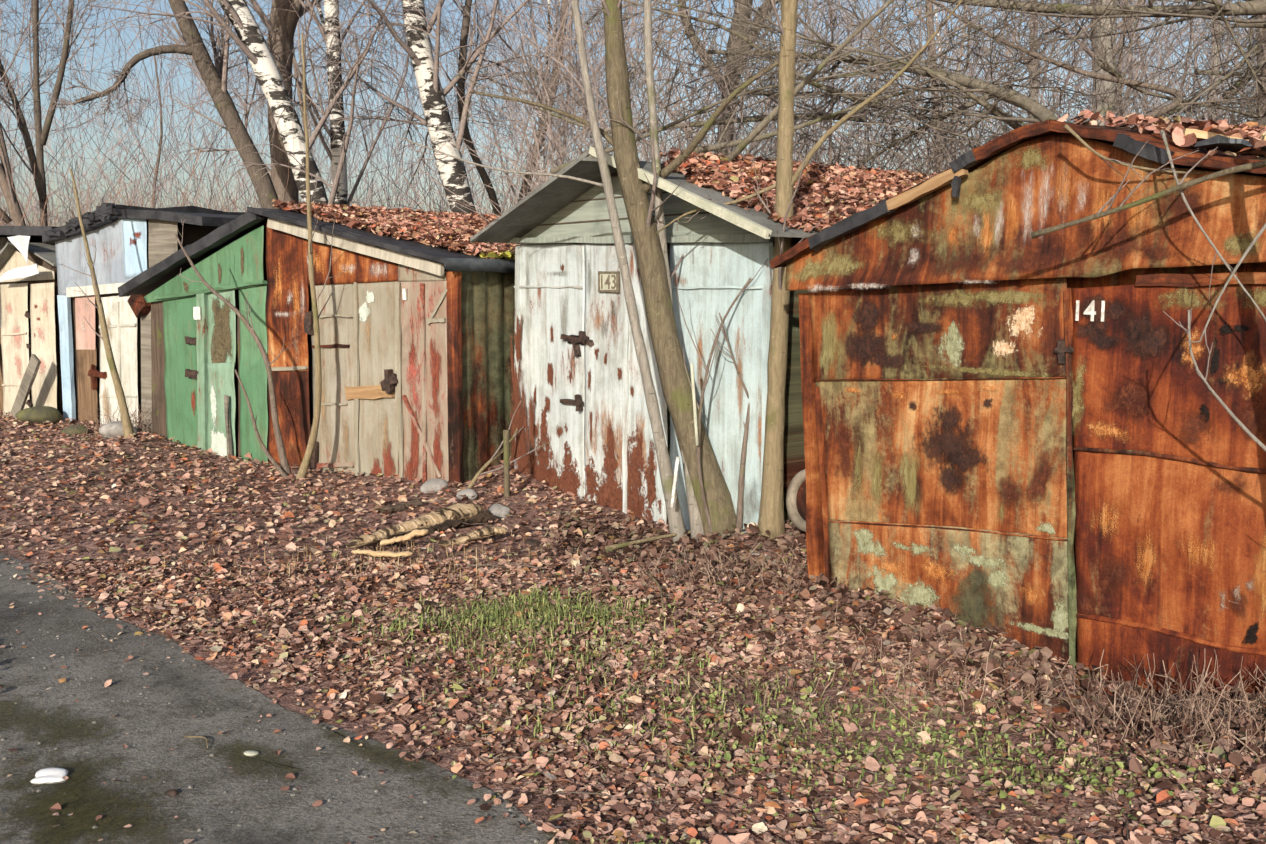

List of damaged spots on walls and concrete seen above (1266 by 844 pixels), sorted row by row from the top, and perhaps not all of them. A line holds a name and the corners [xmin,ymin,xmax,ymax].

rust [929,196,1043,274]
rust [1078,179,1201,262]
rust [1183,332,1201,364]
peeling [210,386,233,457]
peeling [403,335,443,481]
peeling [509,312,664,525]
rust [912,389,987,494]
rust [1000,452,1051,505]
rust [1089,381,1148,437]
rust [1227,363,1266,441]
rust [1100,507,1118,532]
rust [924,562,954,579]